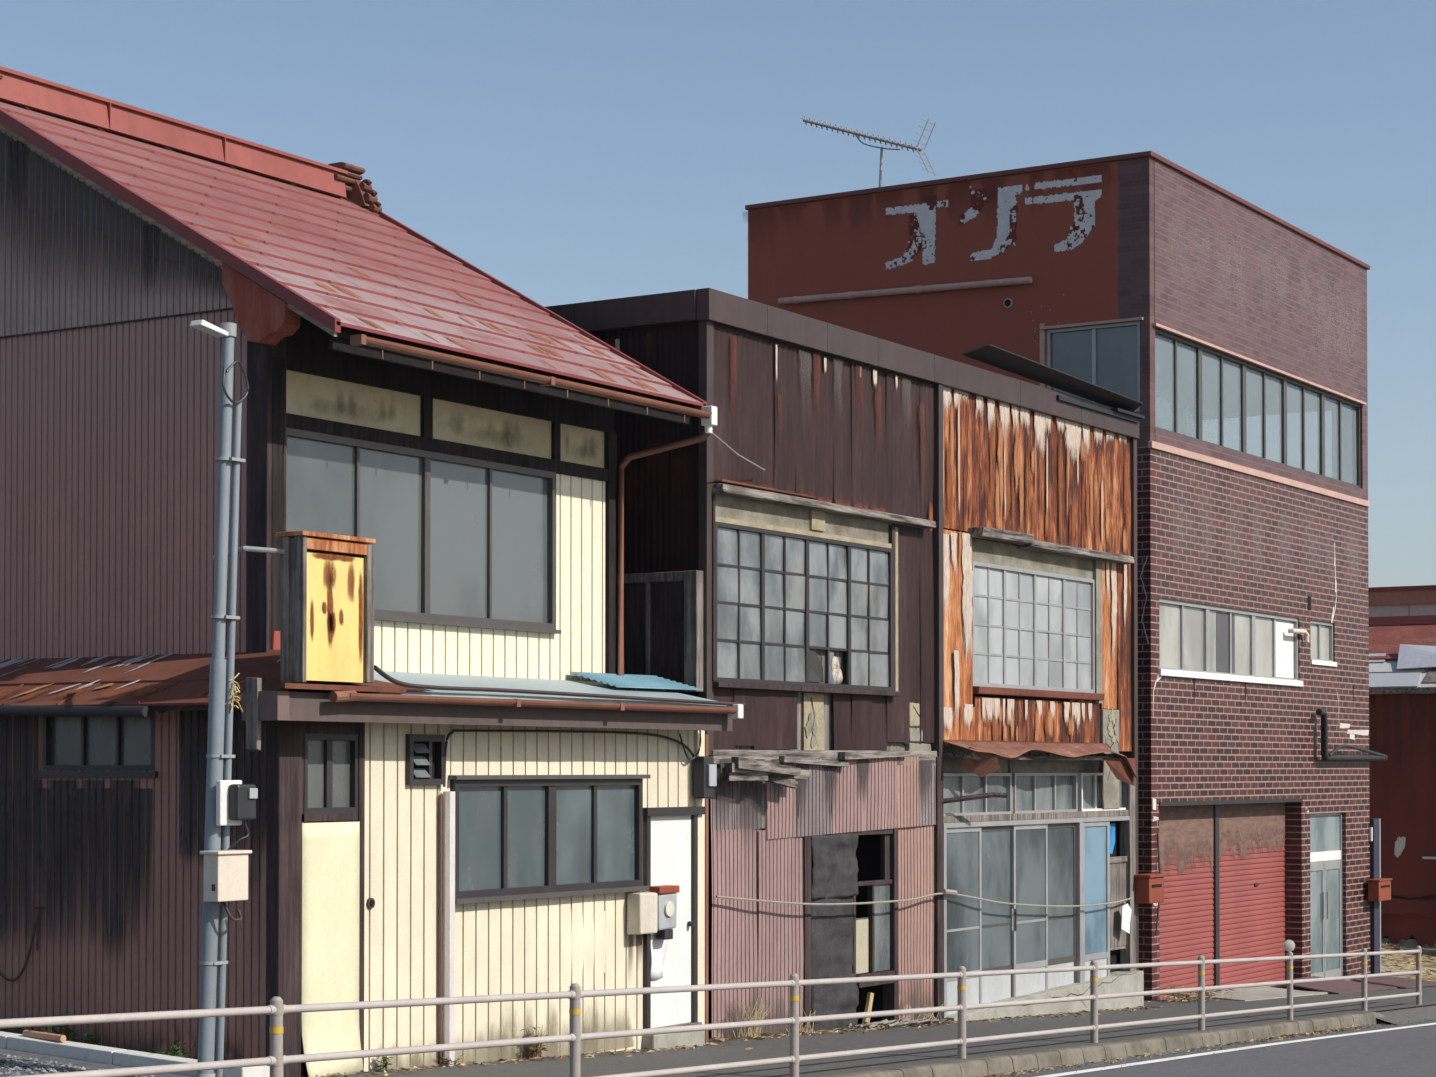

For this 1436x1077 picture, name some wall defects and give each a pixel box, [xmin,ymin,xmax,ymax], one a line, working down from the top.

damp [0,131,224,289]
peeling [894,186,1026,266]
peeling [1060,180,1094,252]
corrosion [856,365,898,419]
corrosion [929,409,971,522]
corrosion [988,418,1130,552]
corrosion [982,698,1092,741]
damp [179,710,267,858]
damp [753,759,808,794]
damp [857,760,869,784]
damp [0,716,152,948]
corrosion [1159,802,1285,873]